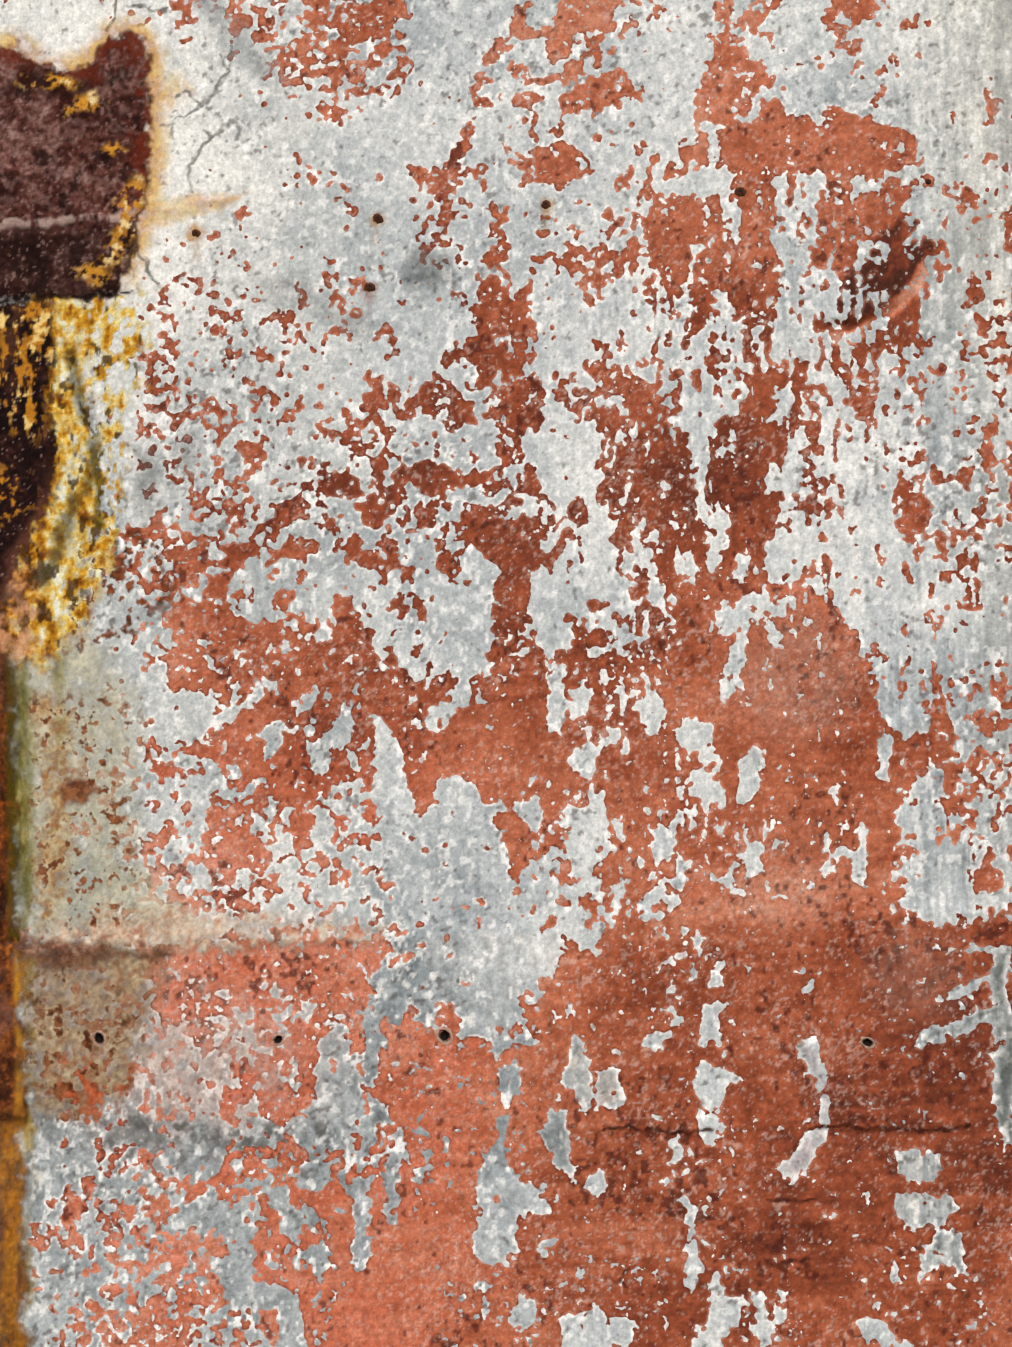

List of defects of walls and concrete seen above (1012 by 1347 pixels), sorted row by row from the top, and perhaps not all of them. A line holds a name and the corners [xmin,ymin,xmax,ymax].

peeling [99,0,423,127]
peeling [820,0,890,80]
peeling [282,152,383,232]
peeling [406,0,680,270]
peeling [250,256,368,378]
peeling [942,181,1012,414]
peeling [892,414,1012,641]
peeling [386,592,434,622]
peeling [749,553,890,680]
rust [0,24,237,1347]
crack [603,1124,713,1135]
crack [816,1122,971,1132]